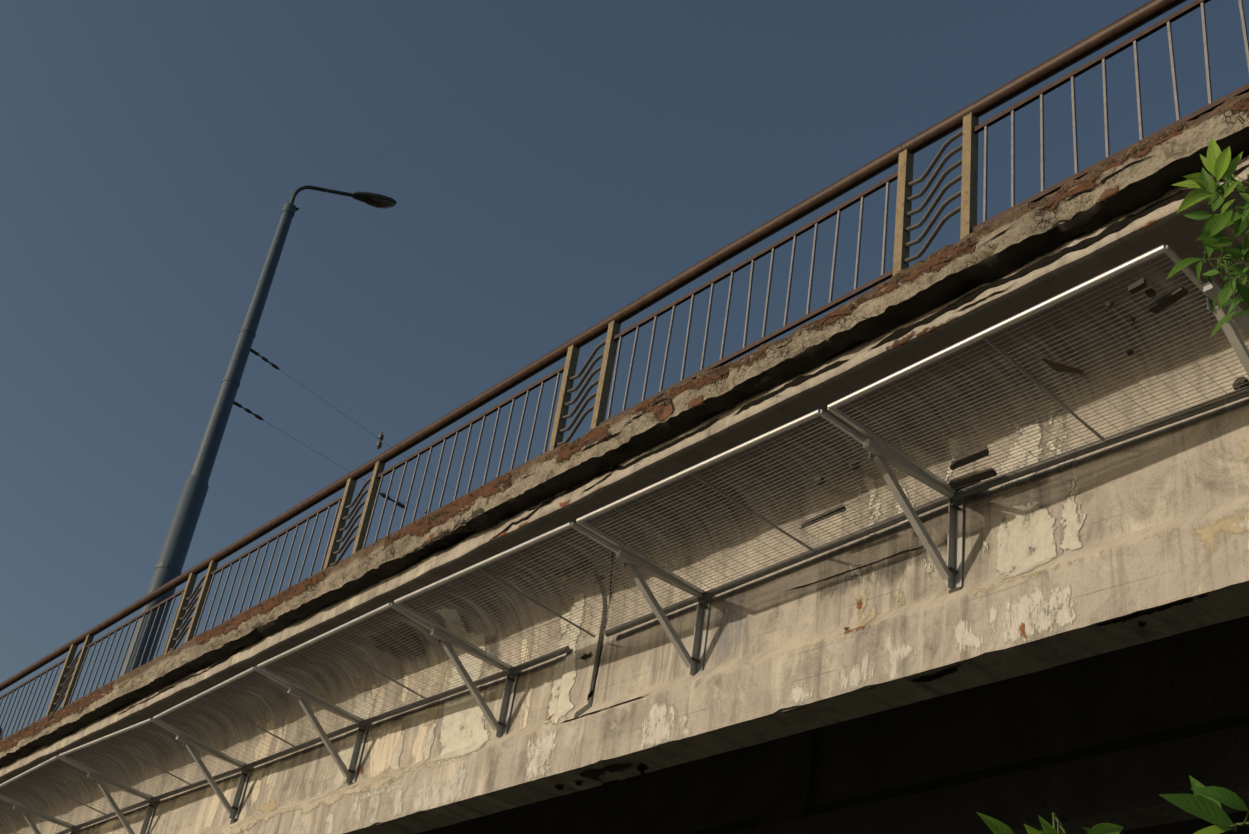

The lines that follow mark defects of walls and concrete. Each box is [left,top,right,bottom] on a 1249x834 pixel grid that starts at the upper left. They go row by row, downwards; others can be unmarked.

spalling [411,507,491,553]
peeling [856,475,881,539]
peeling [896,481,915,531]
peeling [979,404,1086,581]